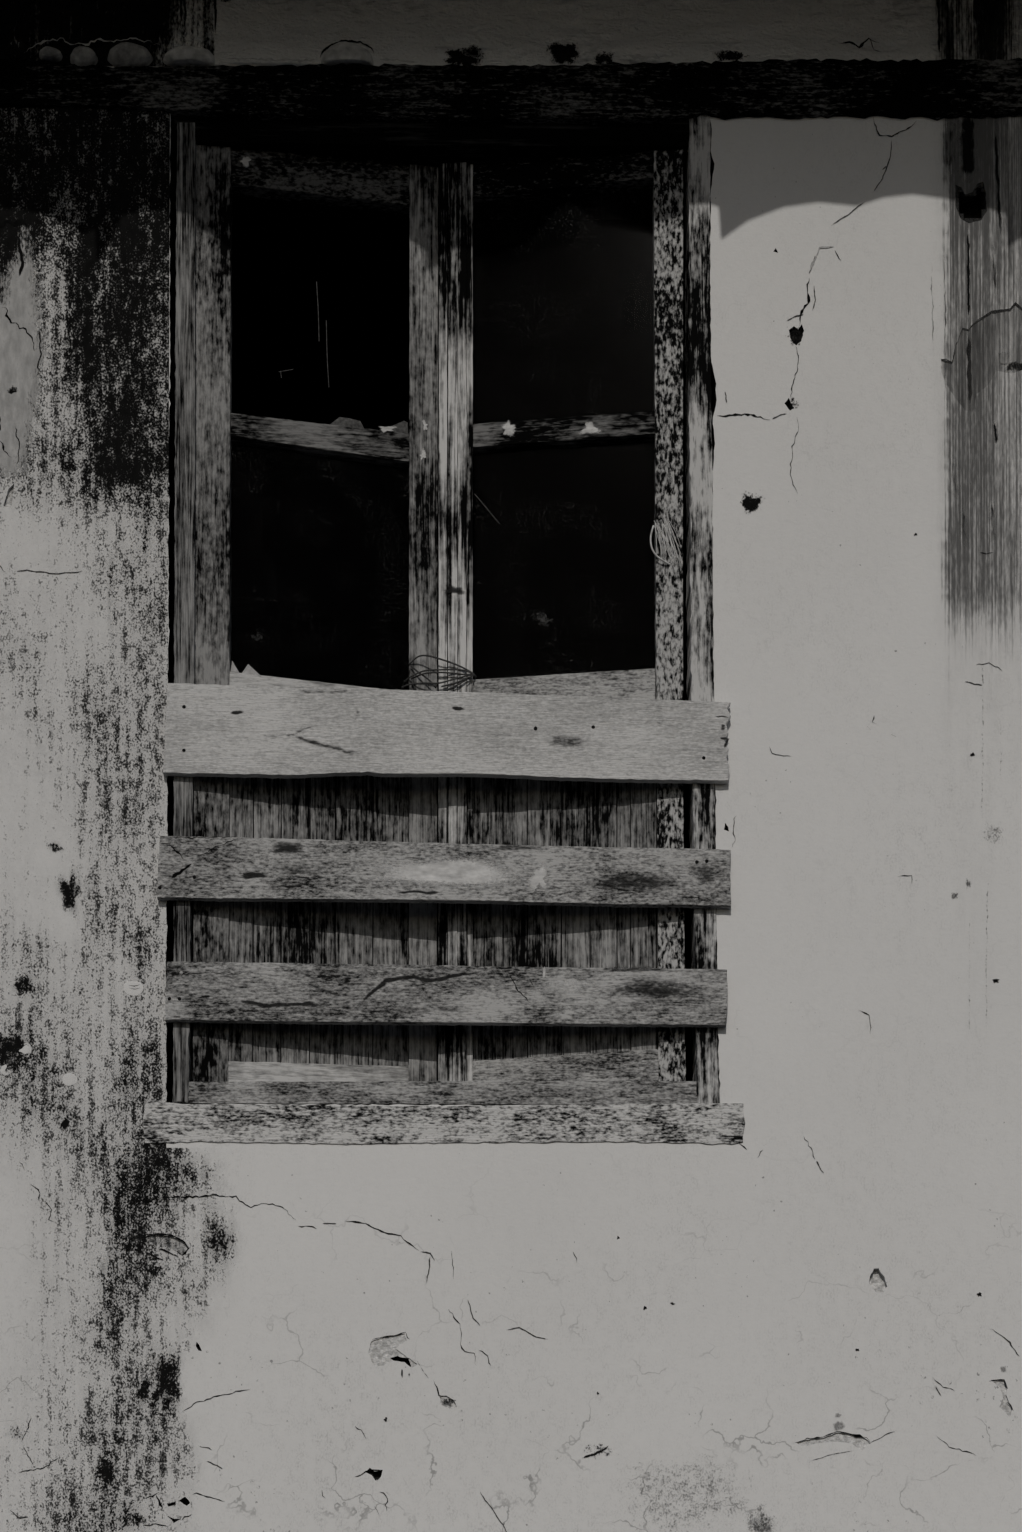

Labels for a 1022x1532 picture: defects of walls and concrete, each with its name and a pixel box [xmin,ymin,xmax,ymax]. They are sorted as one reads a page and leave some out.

leakage [0,0,228,67]
crack [717,118,914,491]
peeling [941,302,1022,412]
leakage [0,107,225,1532]
crack [161,1194,545,1364]
spalling [369,1332,457,1410]
crack [145,1446,225,1526]
spalling [795,1414,892,1460]